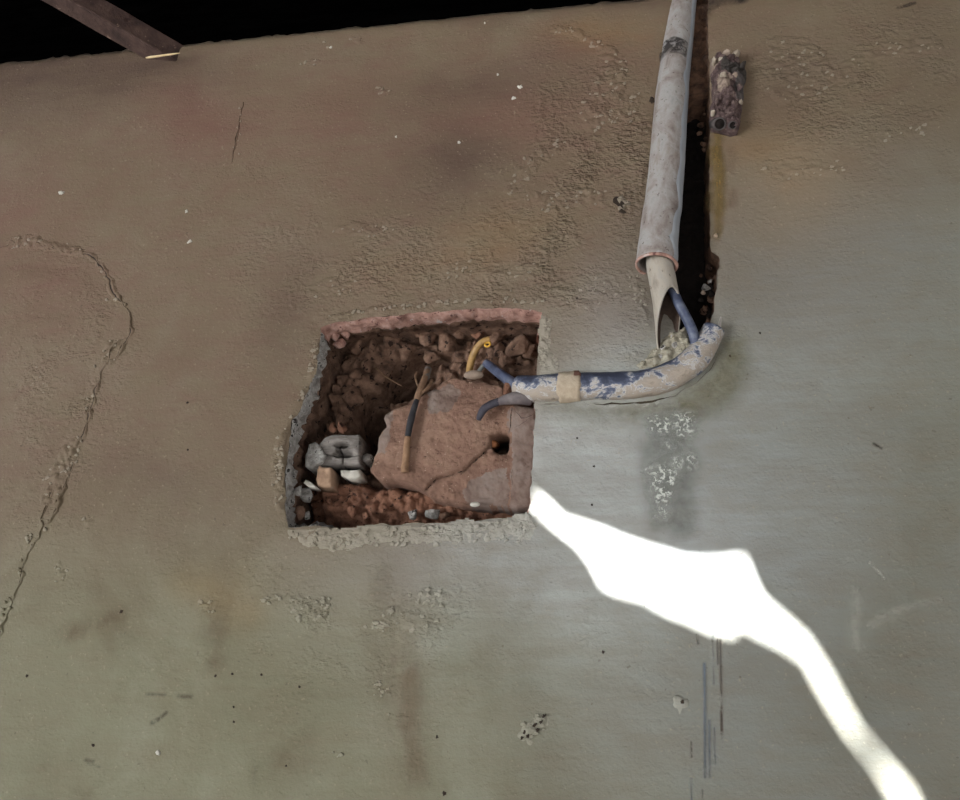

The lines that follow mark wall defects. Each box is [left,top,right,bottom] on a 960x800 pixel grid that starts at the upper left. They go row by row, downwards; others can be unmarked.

crack [232,102,244,160]
crack [0,239,135,643]
spalling [270,308,559,552]
water stain [647,401,696,518]